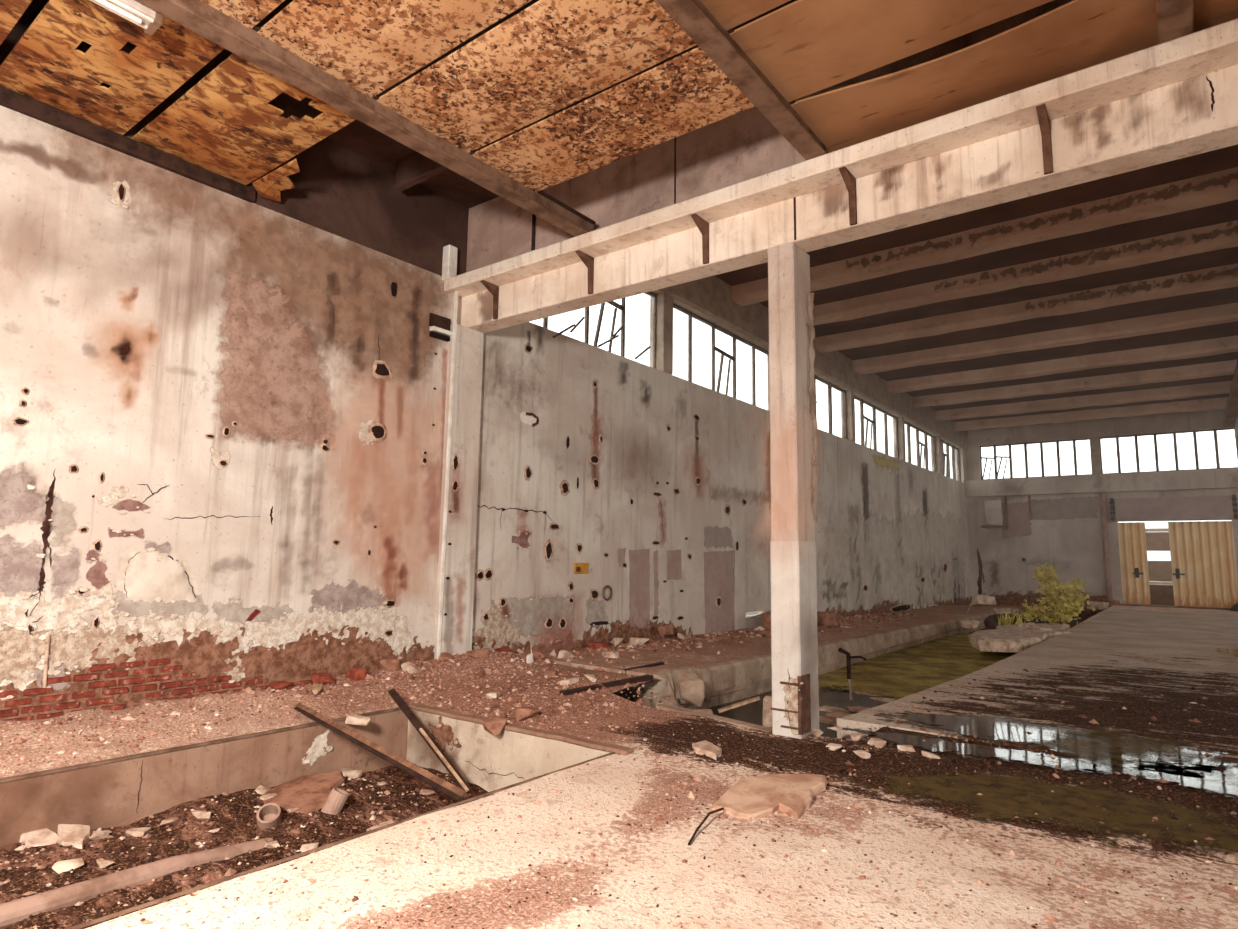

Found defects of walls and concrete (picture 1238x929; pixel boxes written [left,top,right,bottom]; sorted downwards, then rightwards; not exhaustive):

damp [11,146,96,181]
spalling [846,173,1238,268]
flaking render [65,132,442,469]
spalling [935,222,1238,291]
spalling [1025,267,1238,310]
rust [115,332,155,364]
crack [25,470,56,636]
spalling [0,463,435,721]
rust [384,538,407,600]